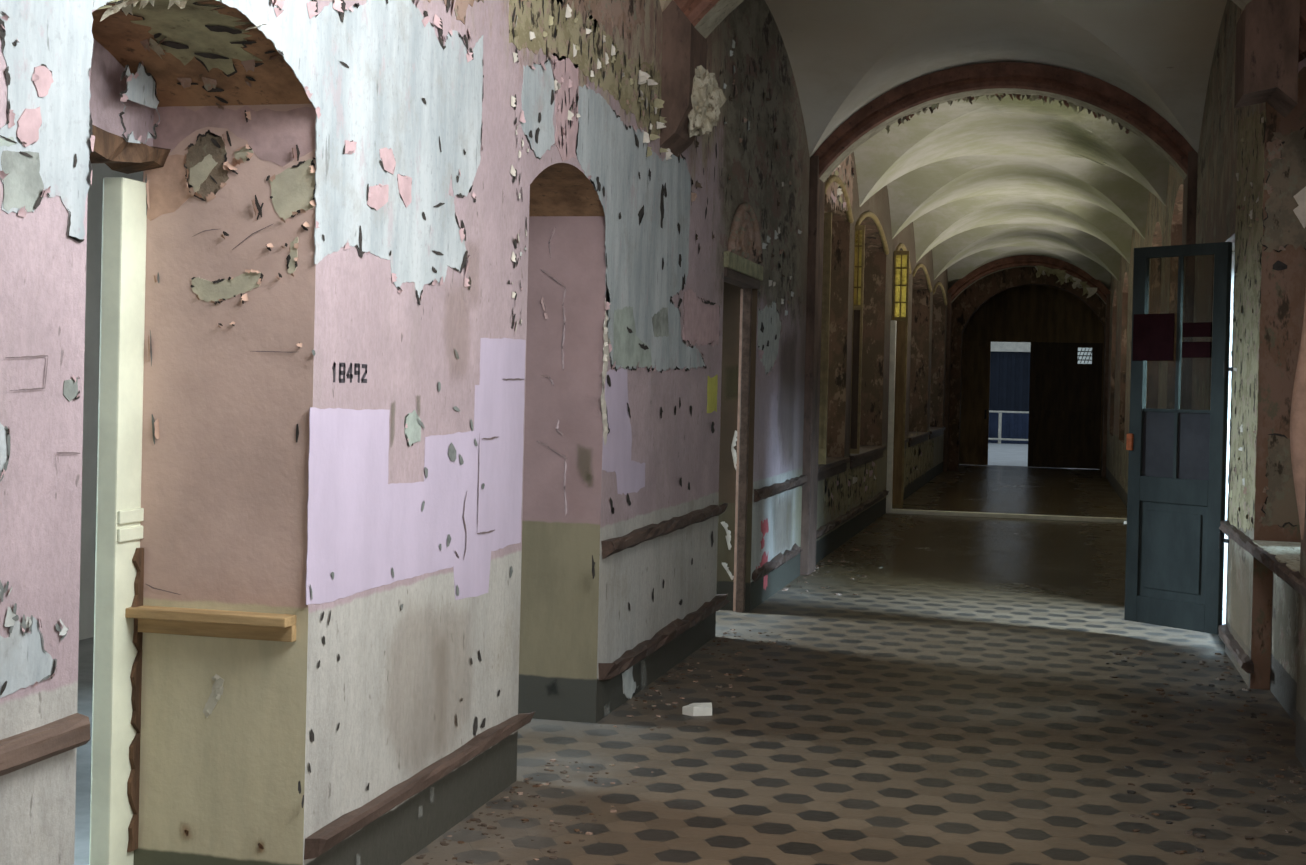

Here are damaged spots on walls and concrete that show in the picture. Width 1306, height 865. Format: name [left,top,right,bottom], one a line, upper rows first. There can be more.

peeling [885,93,1131,134]
peeling [0,0,484,306]
peeling [508,0,771,445]
peeling [63,375,81,401]
peeling [0,423,11,482]
peeling [152,414,160,444]
peeling [0,580,69,698]